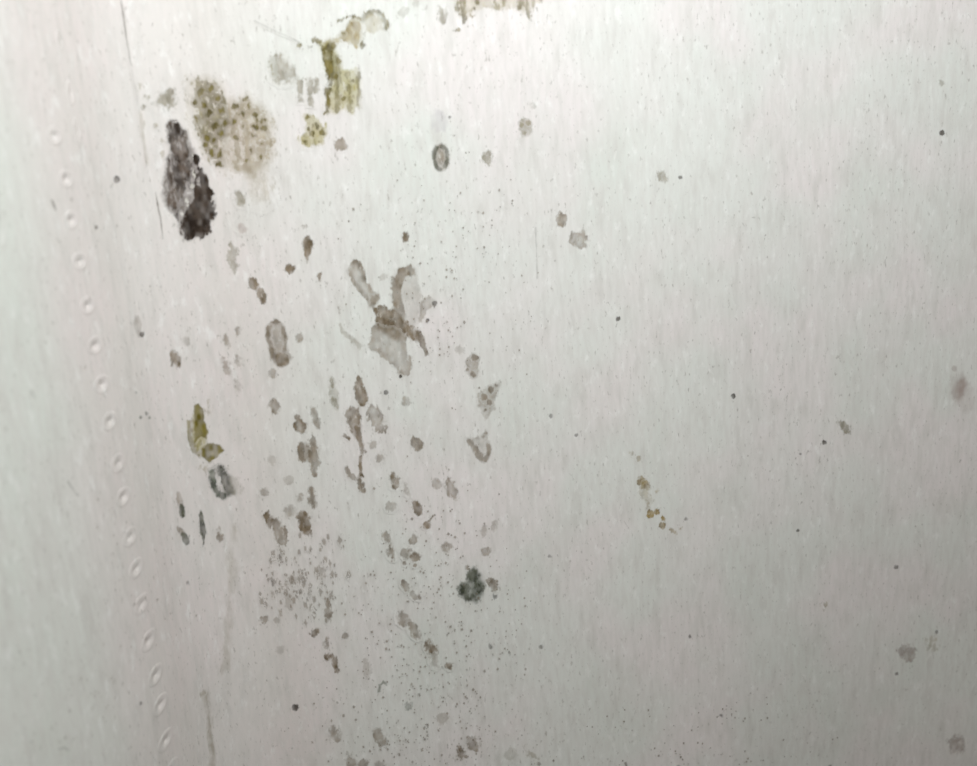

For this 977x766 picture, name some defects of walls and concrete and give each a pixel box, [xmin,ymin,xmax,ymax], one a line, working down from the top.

damp [265,0,423,154]
damp [281,233,325,287]
damp [167,334,194,370]
damp [263,316,306,381]
damp [335,216,505,466]
damp [184,371,557,766]